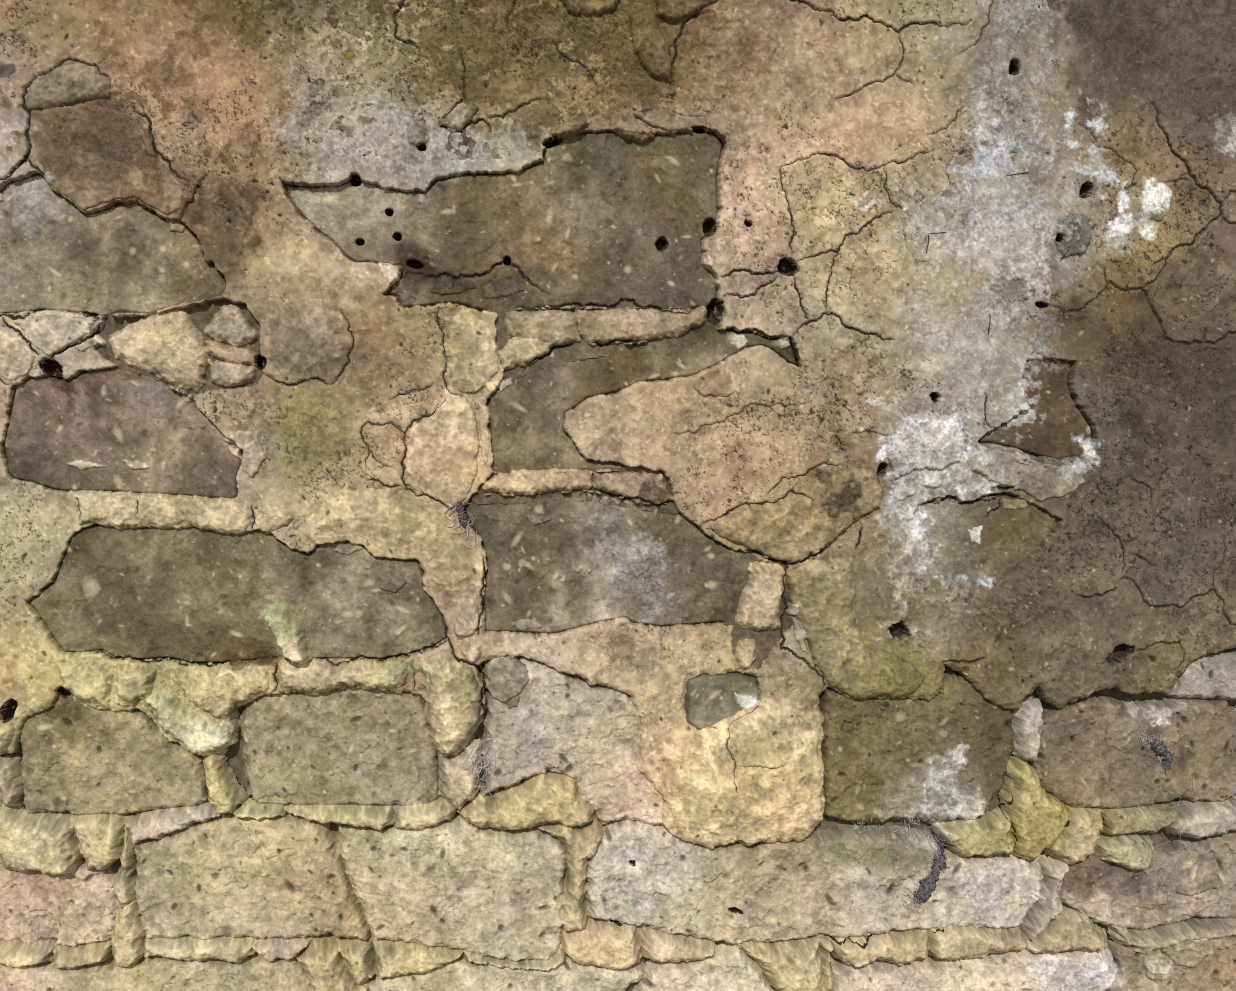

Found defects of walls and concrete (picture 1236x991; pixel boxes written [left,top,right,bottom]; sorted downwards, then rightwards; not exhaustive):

crack [789,0,994,99]
spalling [0,105,266,498]
spalling [30,524,447,662]
crack [360,308,461,510]
spalling [284,103,798,634]
crack [404,107,965,366]
water stain [854,192,881,212]
water stain [876,407,1003,588]
crack [918,486,1017,517]
spalling [887,350,1092,584]
water stain [889,0,1236,426]
water stain [1059,436,1100,479]